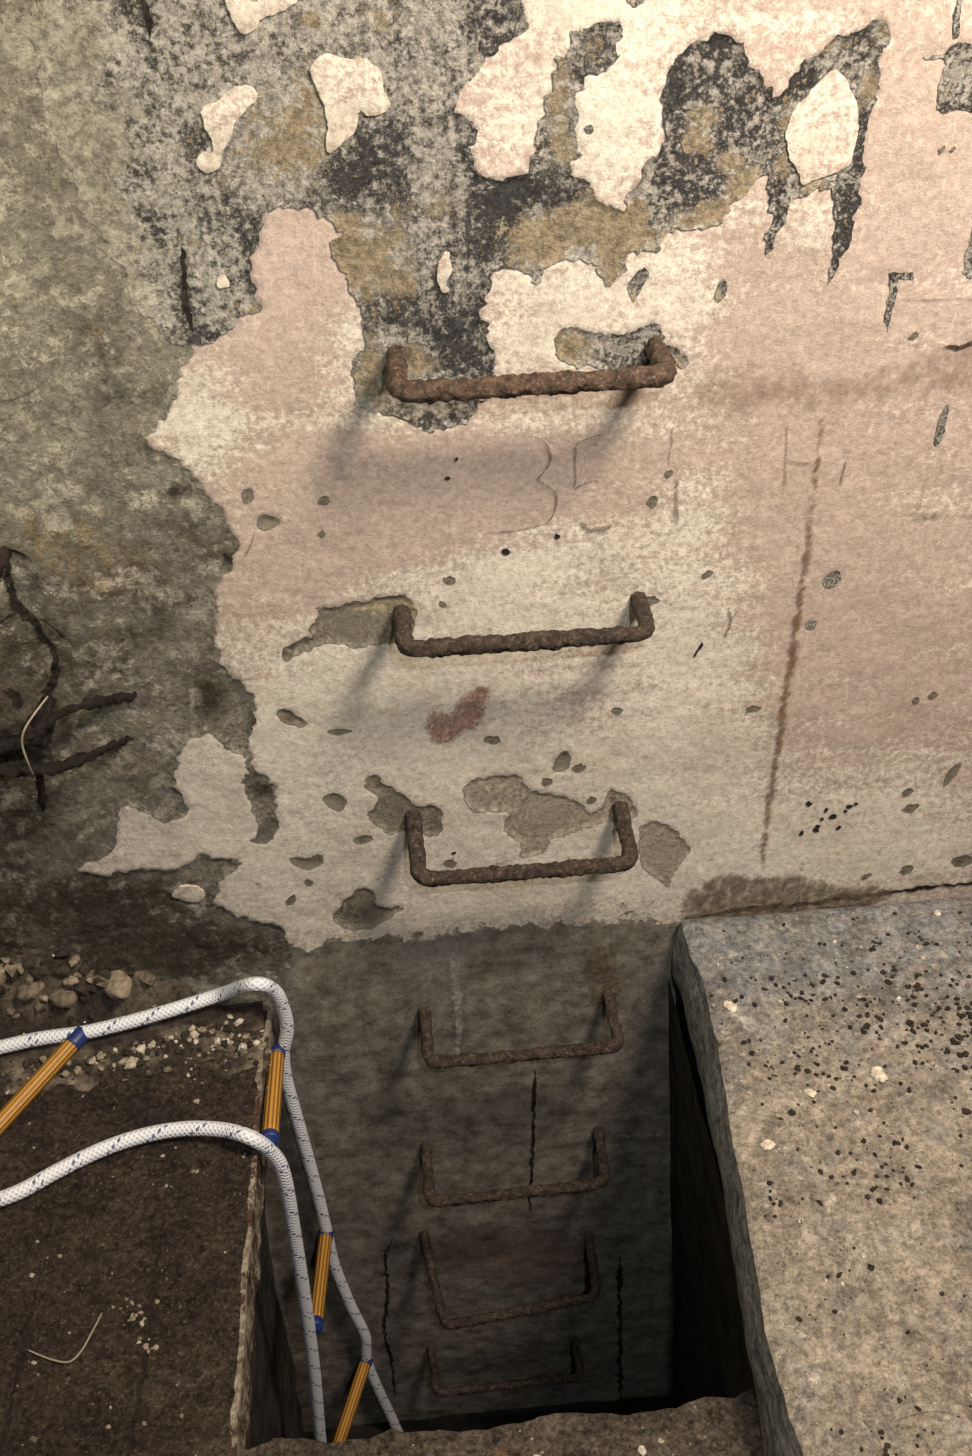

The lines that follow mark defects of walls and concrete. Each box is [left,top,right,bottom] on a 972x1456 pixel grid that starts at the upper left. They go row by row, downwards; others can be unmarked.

flaking render [884,272,914,332]
flaking render [0,0,891,1018]
crack [785,425,846,483]
crack [0,549,65,724]